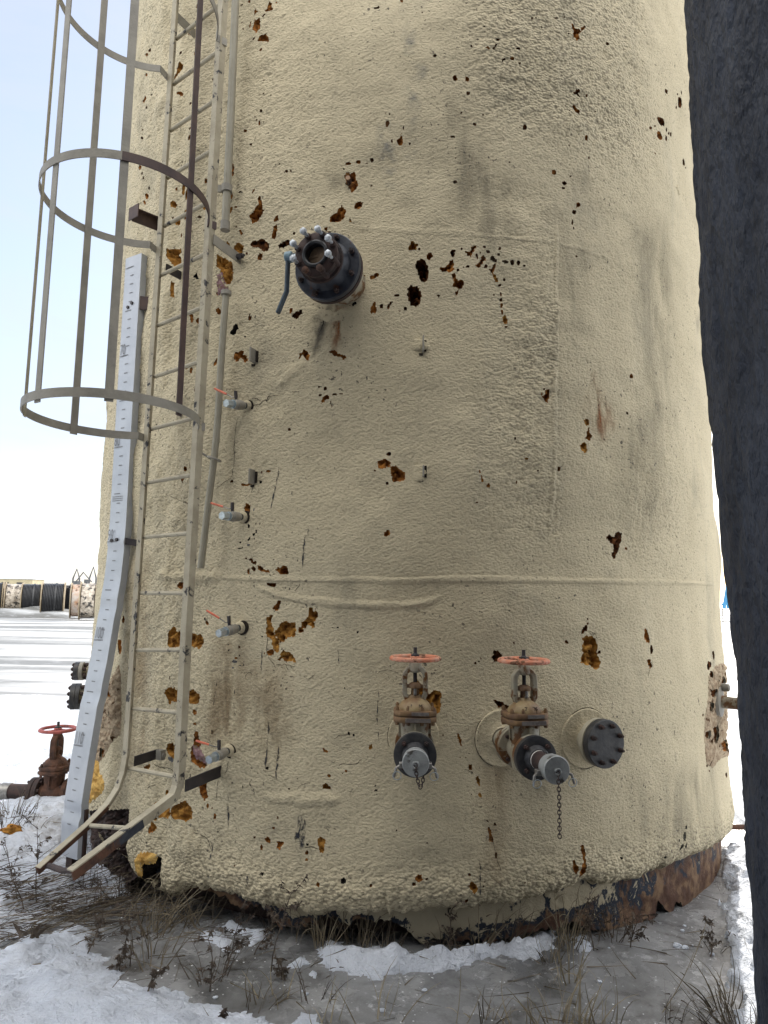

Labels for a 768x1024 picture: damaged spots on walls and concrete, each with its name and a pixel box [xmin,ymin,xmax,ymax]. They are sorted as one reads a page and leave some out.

spalling [702,651,730,778]
hole [98,840,162,889]